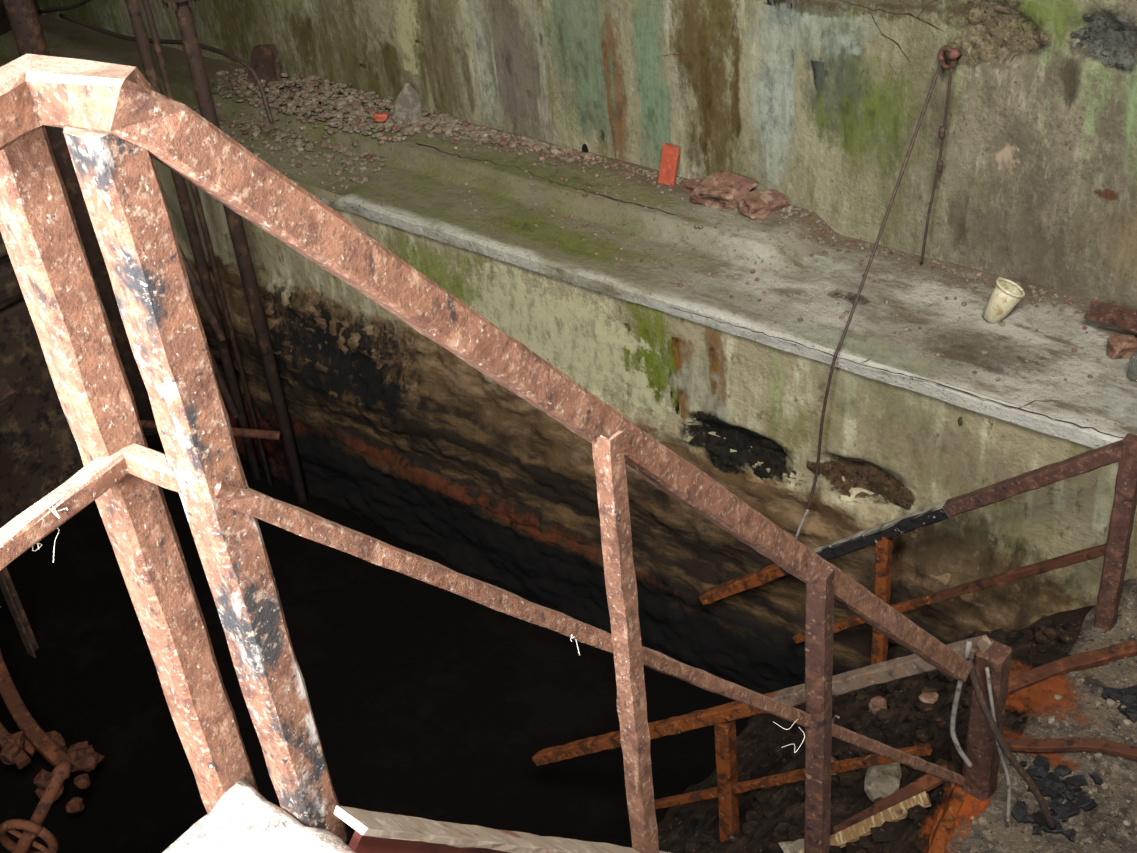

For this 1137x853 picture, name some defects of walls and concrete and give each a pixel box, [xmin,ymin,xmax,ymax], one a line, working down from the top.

corrosion [601,18,627,156]
spalling [1070,9,1137,73]
water stain [262,286,417,424]
spalling [152,157,611,633]
water stain [644,331,678,405]
spalling [290,179,1094,550]
spalling [626,466,806,694]
spalling [827,544,876,594]
spalling [832,602,873,676]
spalling [887,637,914,661]
spalling [889,462,1119,645]
spalling [1124,506,1137,581]